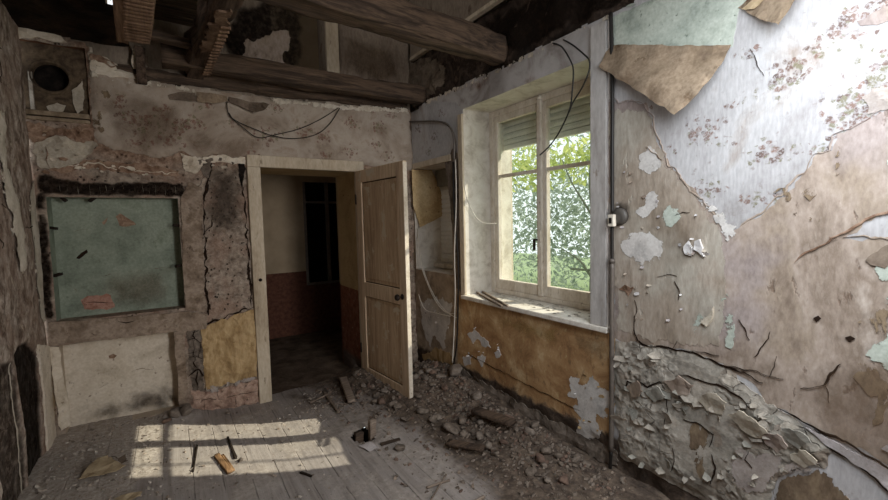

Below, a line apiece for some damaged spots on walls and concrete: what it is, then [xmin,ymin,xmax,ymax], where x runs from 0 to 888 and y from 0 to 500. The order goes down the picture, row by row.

flaking render [599,0,746,47]
flaking render [26,111,104,170]
flaking render [186,330,259,410]
crack [194,163,253,333]
peeling [461,109,833,500]
crack [633,300,779,383]
flaking render [865,335,888,370]
flaking render [874,266,888,281]
crack [778,408,888,492]